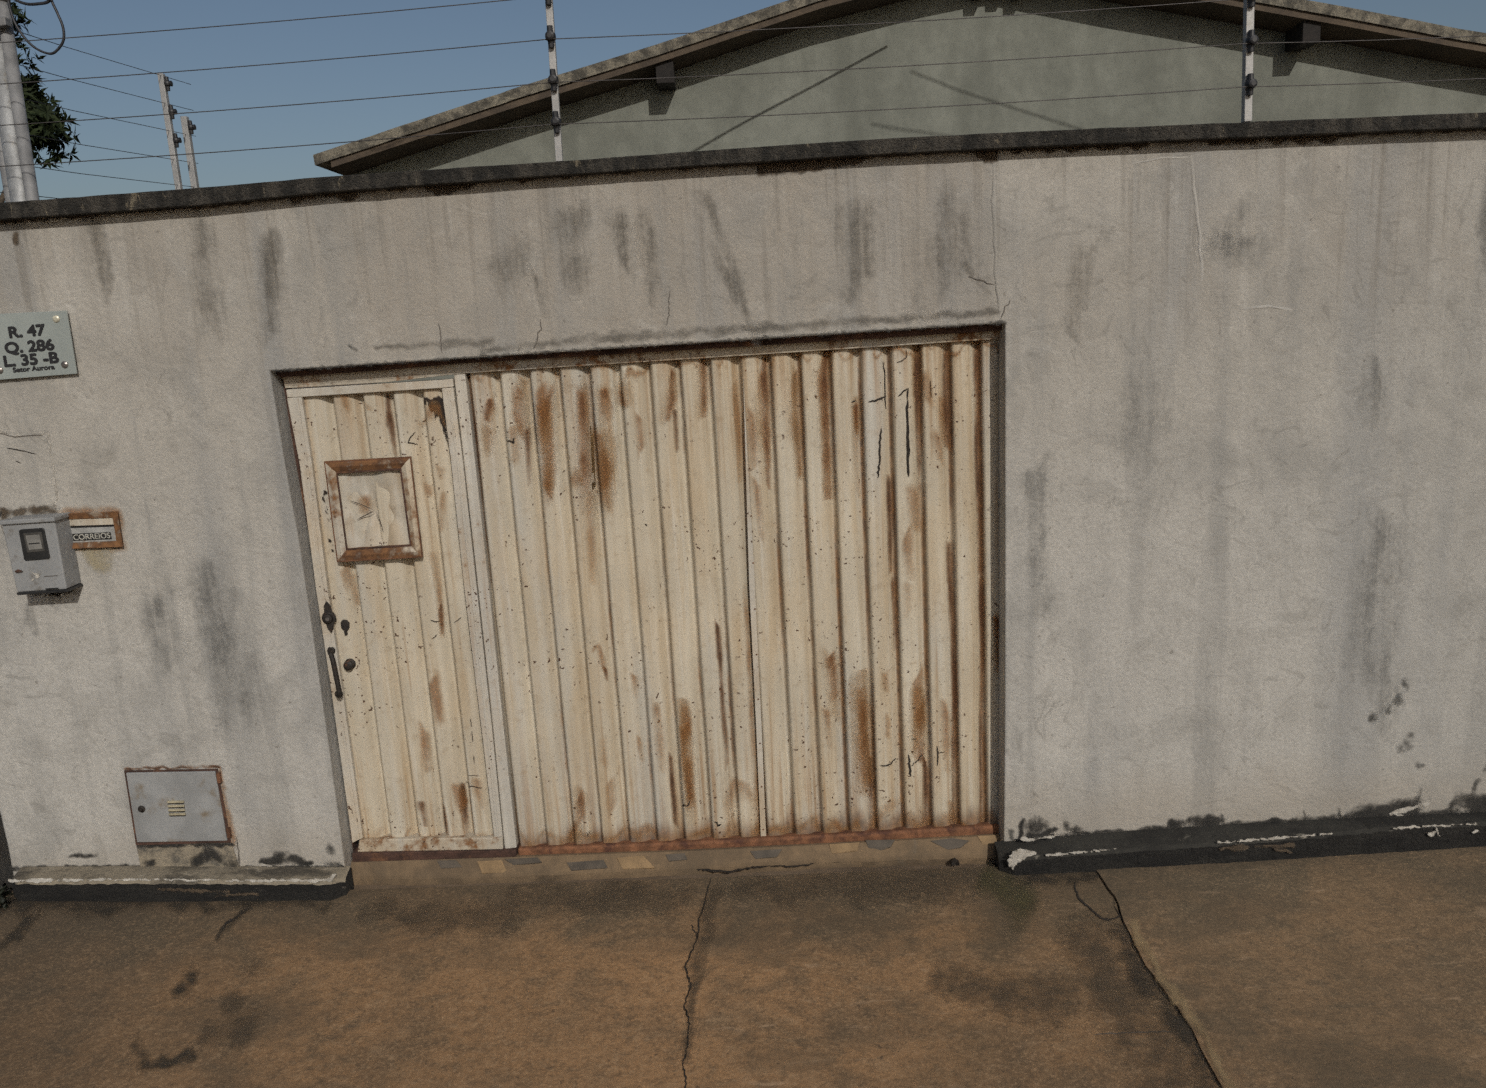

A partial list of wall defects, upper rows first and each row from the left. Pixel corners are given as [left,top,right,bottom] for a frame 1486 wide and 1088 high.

water stain [677,153,937,176]
water stain [965,143,1150,163]
water stain [1170,133,1396,145]
rust [469,382,493,542]
rust [716,623,727,743]
rust [945,544,958,759]
rust [979,563,999,799]
peeling [1008,835,1116,870]
water stain [1009,769,1486,841]
peeling [1217,833,1332,853]
peeling [1389,802,1479,837]
crack [682,862,837,1088]